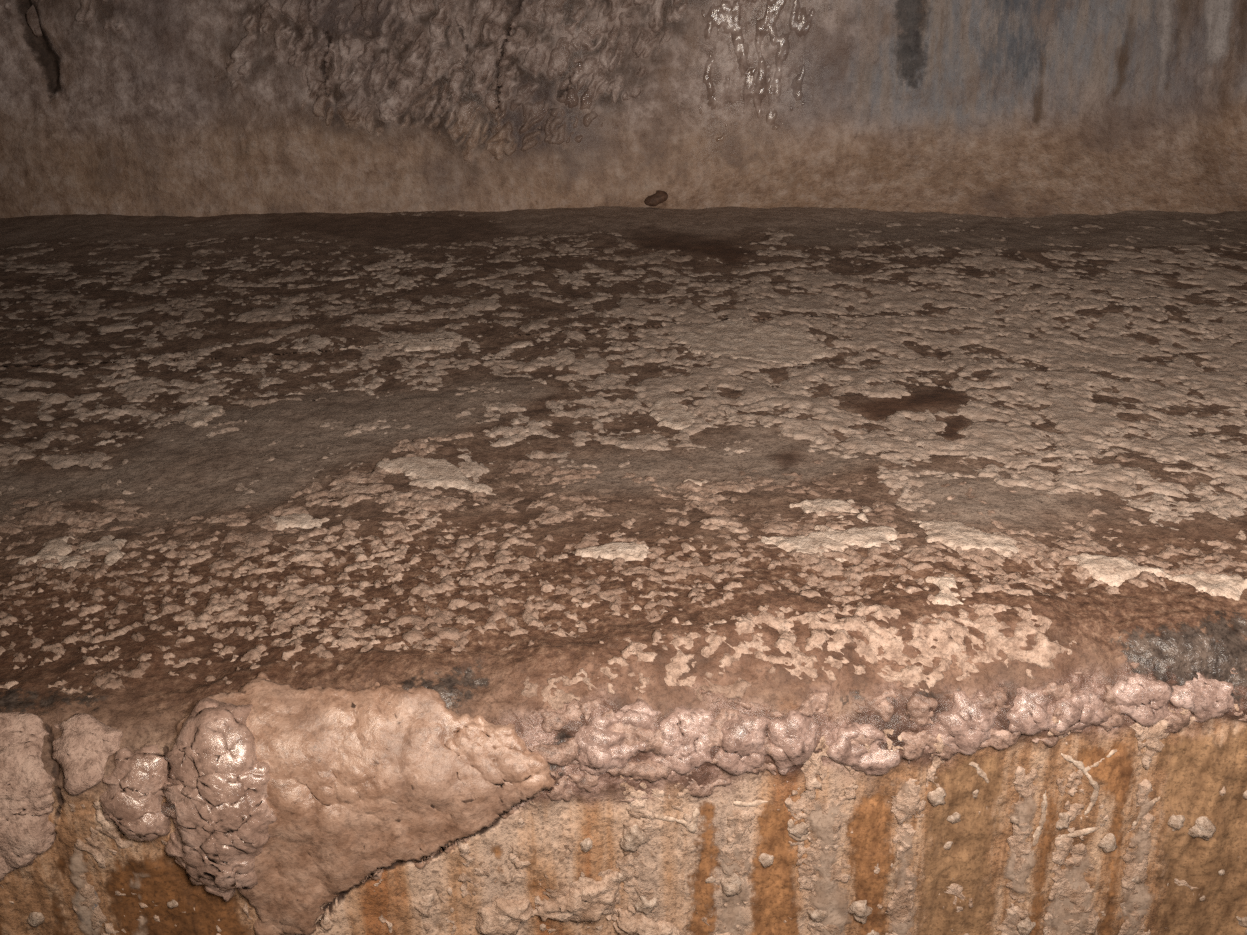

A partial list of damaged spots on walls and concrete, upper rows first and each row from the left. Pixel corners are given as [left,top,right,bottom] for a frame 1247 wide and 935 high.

leakage [699,0,815,130]
leakage [1205,0,1245,61]
peeling [0,209,1247,935]
leakage [1111,610,1247,702]
rust [106,856,251,935]
rust [751,804,801,935]
rust [847,793,895,935]
leakage [902,785,961,824]
rust [914,756,1004,935]
rust [1078,744,1134,935]
leakage [1167,814,1216,841]
rust [1155,729,1247,935]